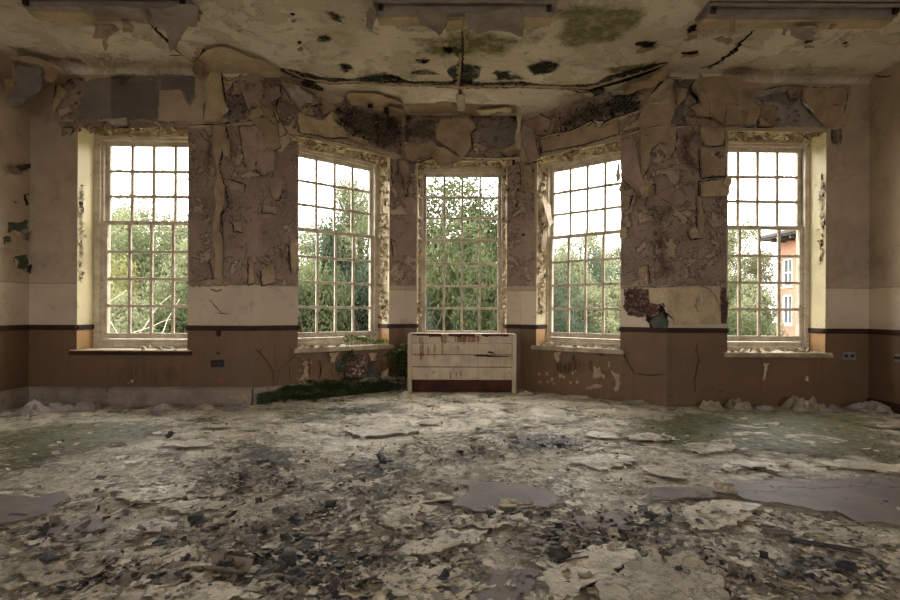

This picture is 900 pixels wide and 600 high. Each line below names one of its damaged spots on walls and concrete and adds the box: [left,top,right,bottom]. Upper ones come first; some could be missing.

crack [188,28,665,157]
water stain [281,46,668,128]
crack [539,30,754,148]
peeling [3,220,31,246]
peeling [7,56,851,328]
spalling [327,351,389,383]
peeling [538,362,620,392]